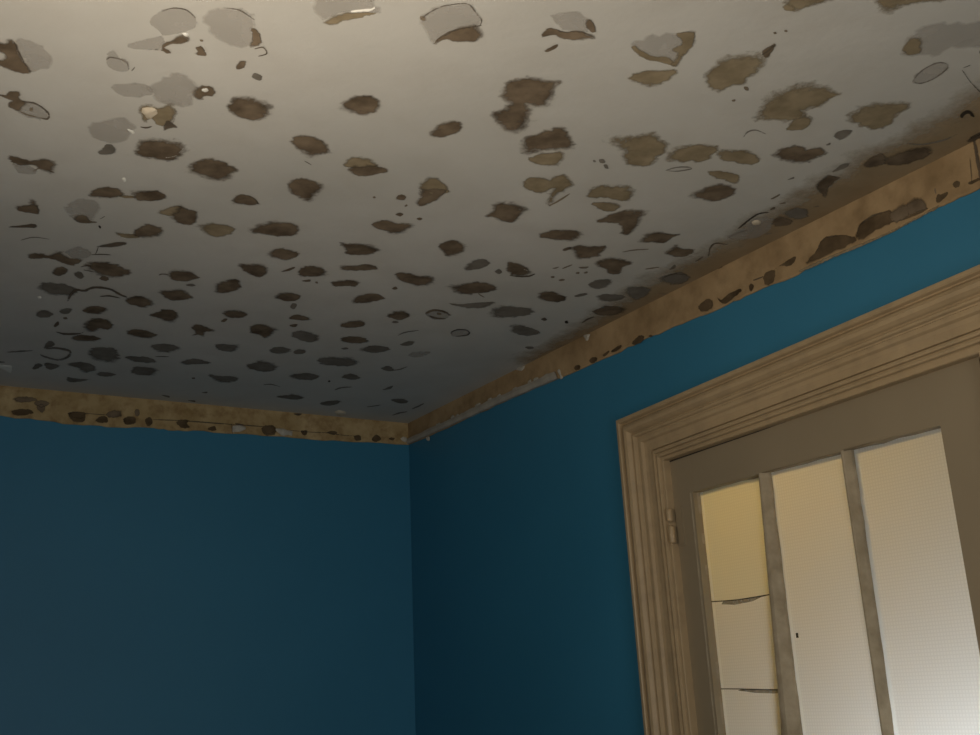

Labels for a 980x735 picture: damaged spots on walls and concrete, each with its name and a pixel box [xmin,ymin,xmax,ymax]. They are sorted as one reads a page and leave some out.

spalling [0,40,31,74]
peeling [420,3,482,44]
peeling [542,20,596,52]
peeling [629,32,695,86]
spalling [706,30,787,91]
spalling [127,105,184,161]
spalling [227,98,270,120]
spalling [343,95,379,115]
spalling [492,78,574,206]
spalling [757,84,839,130]
spalling [775,104,908,162]
flaking render [0,133,980,445]